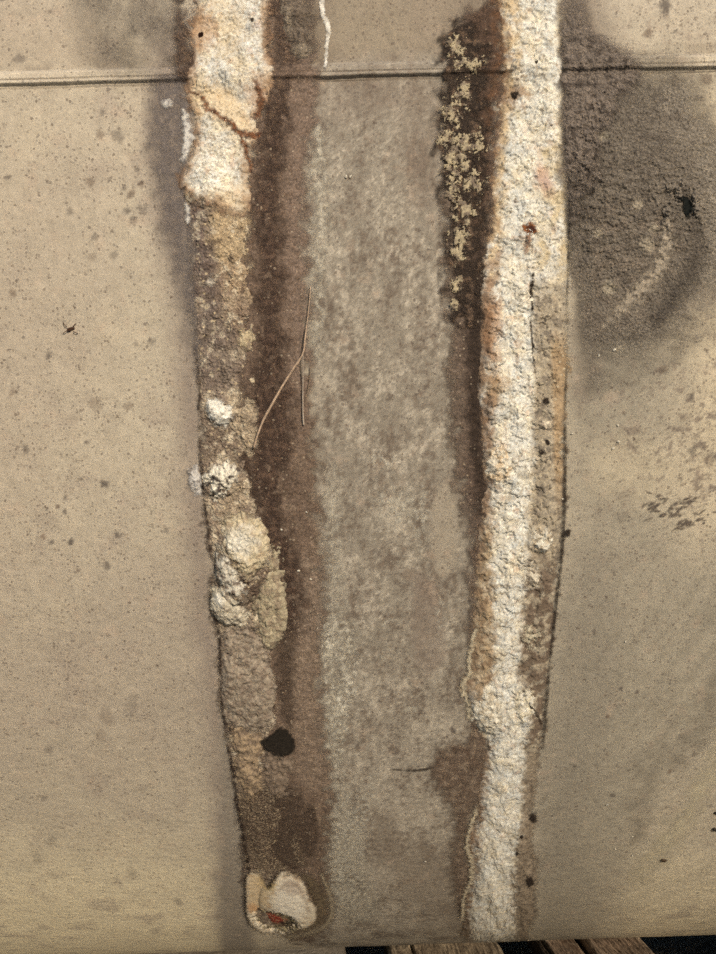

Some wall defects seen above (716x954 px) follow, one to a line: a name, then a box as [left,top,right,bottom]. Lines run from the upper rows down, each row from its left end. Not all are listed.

damp [310,127,327,342]
peeling [431,17,494,329]
spalling [185,192,314,934]
damp [459,0,572,943]
damp [317,616,375,921]